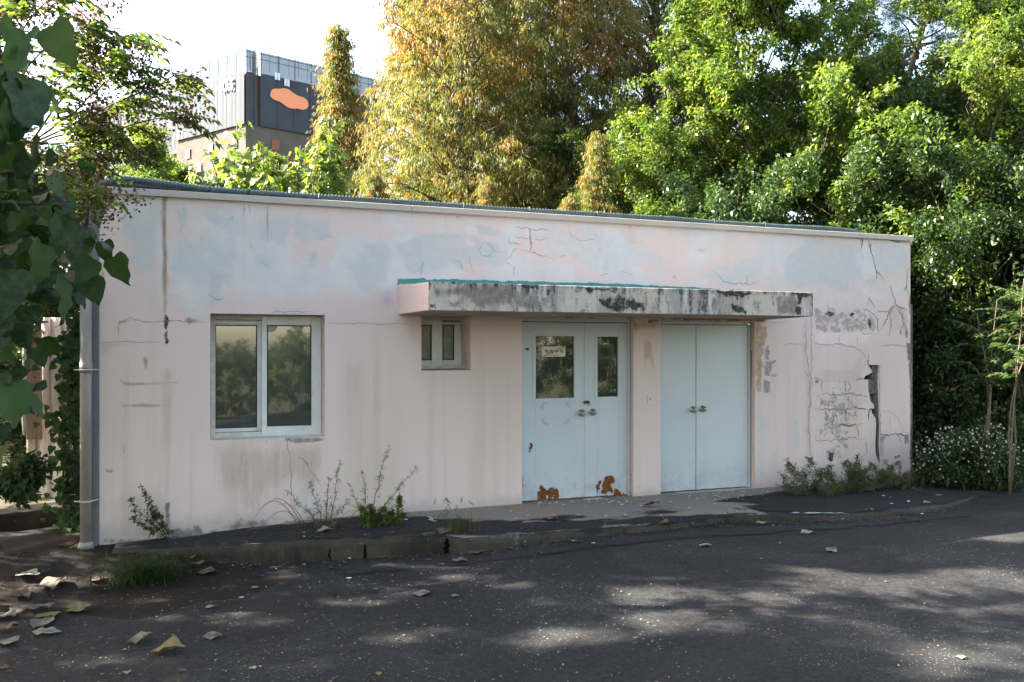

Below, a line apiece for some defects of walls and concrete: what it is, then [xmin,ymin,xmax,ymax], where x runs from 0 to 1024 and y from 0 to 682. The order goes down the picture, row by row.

crack [456,227,598,274]
crack [99,317,197,343]
mould [428,282,550,310]
leakage [582,287,657,331]
flaking render [814,306,875,333]
flaking render [754,324,777,394]
crack [716,237,909,470]
rust [528,475,631,502]